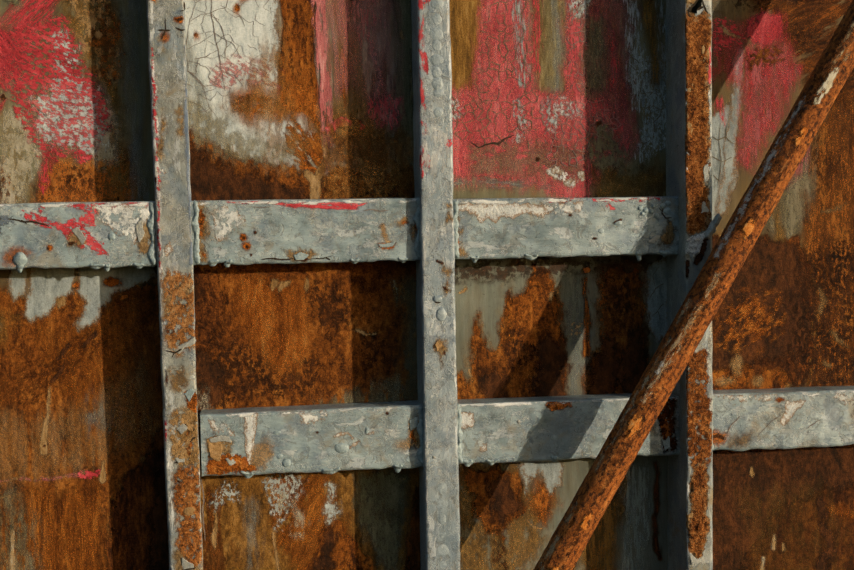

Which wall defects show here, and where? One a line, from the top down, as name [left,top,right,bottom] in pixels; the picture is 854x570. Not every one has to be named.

peeling [0,0,318,474]
corrosion [0,0,421,570]
crack [158,0,283,120]
peeling [299,410,327,434]
peeling [422,128,585,223]
corrosion [457,264,572,411]
crack [452,0,666,170]
peeling [541,97,584,131]
corrosion [648,10,720,249]
corrosion [553,68,854,570]
peeling [708,22,854,257]
corrosion [459,462,556,570]